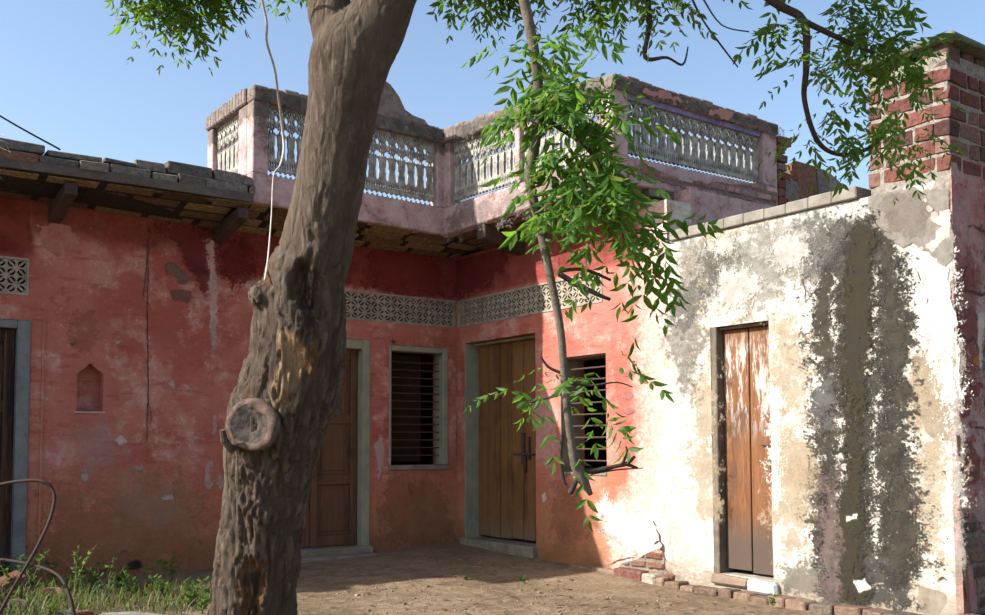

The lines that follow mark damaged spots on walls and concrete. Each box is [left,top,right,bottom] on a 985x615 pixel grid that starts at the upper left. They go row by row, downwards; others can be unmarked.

peeling [164,262,192,304]
peeling [204,239,219,351]
peeling [913,197,985,489]
damp [702,191,985,611]
flaking render [958,509,985,615]